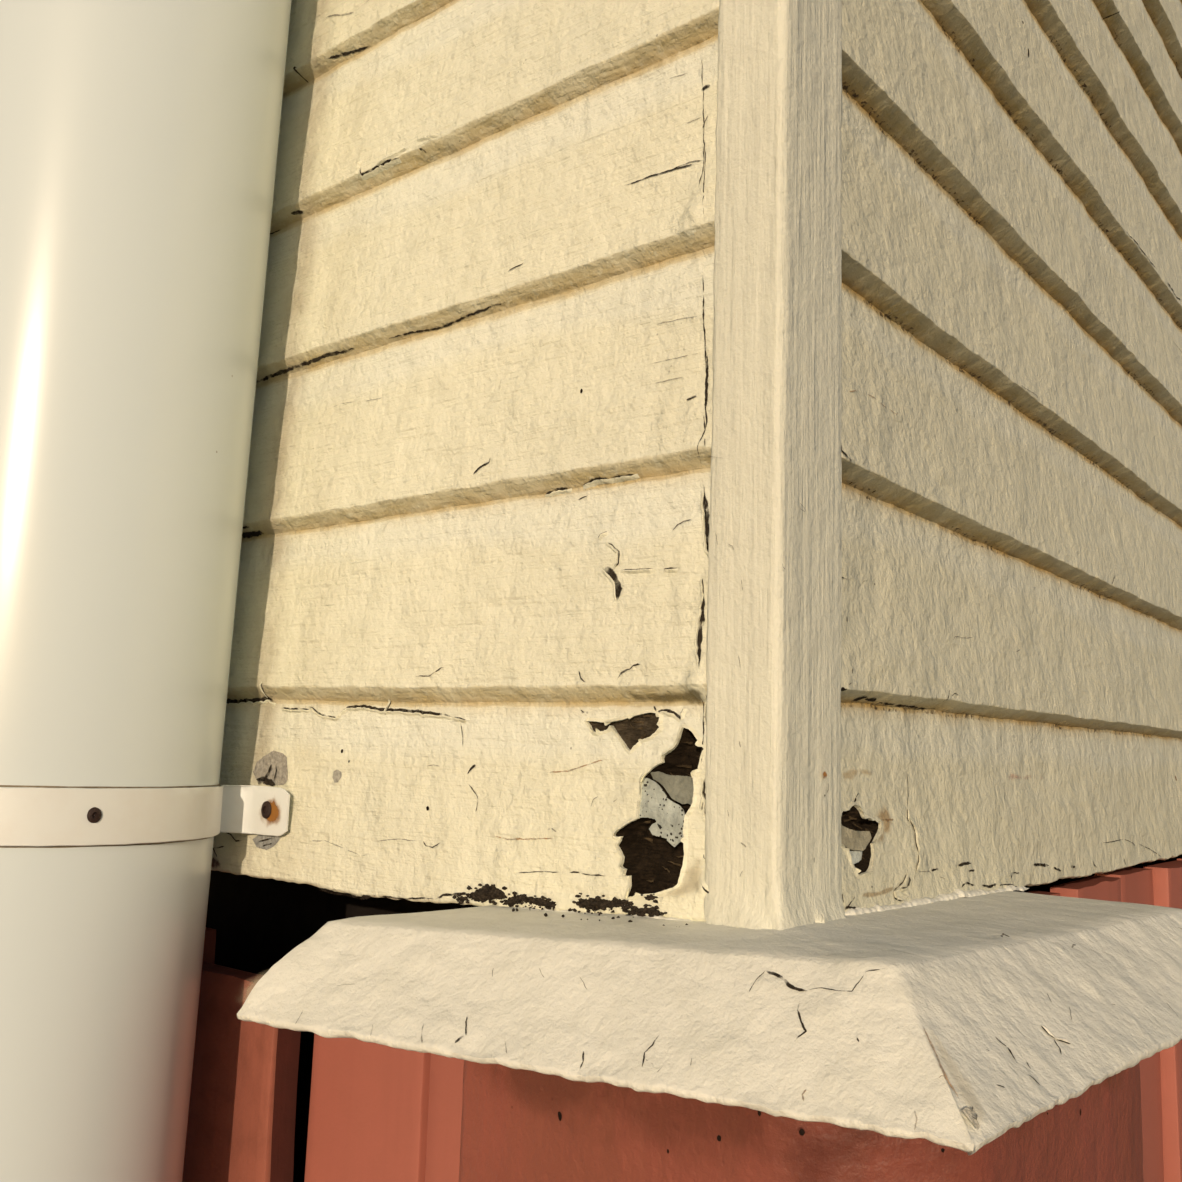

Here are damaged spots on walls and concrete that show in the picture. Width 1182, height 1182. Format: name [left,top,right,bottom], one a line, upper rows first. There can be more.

crack [545,474,640,500]
crack [673,491,730,548]
crack [598,531,679,600]
crack [697,597,705,664]
peeling [584,709,664,755]
corrosion [267,800,279,823]
peeling [612,724,706,902]
peeling [841,801,882,879]
crack [886,809,1161,901]
crack [749,969,880,1037]